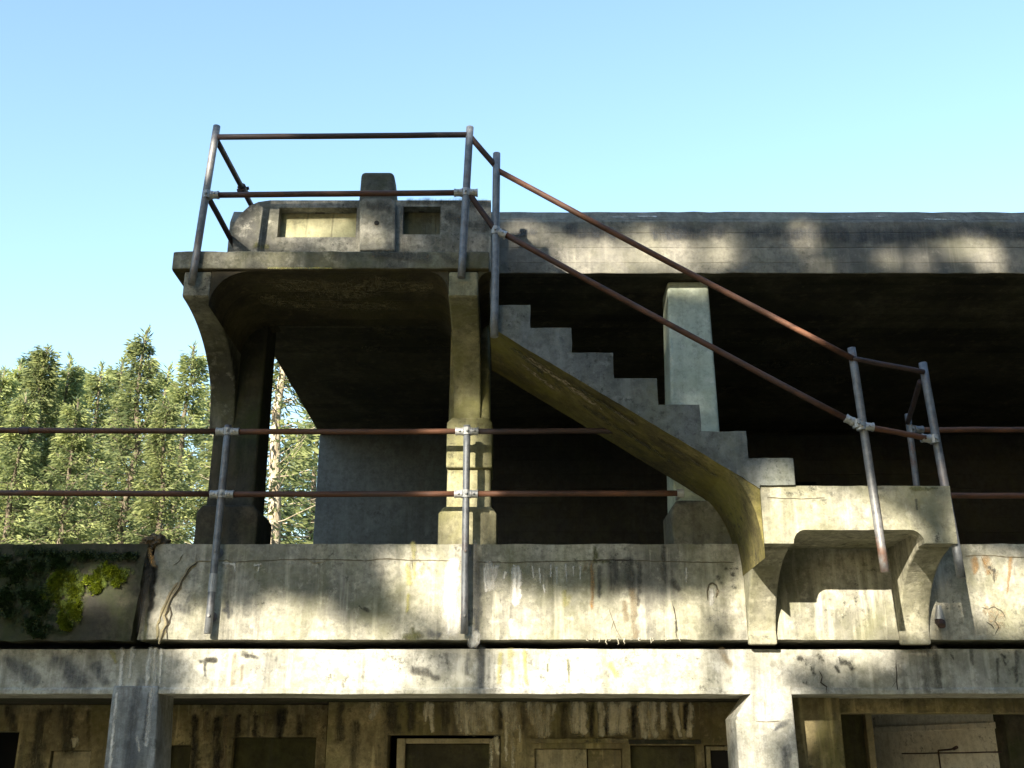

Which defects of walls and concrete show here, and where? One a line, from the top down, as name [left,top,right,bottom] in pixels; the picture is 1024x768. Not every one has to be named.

damp [0,544,163,768]
crack [156,555,734,644]
damp [430,544,581,689]
damp [190,710,303,768]
damp [336,702,693,763]